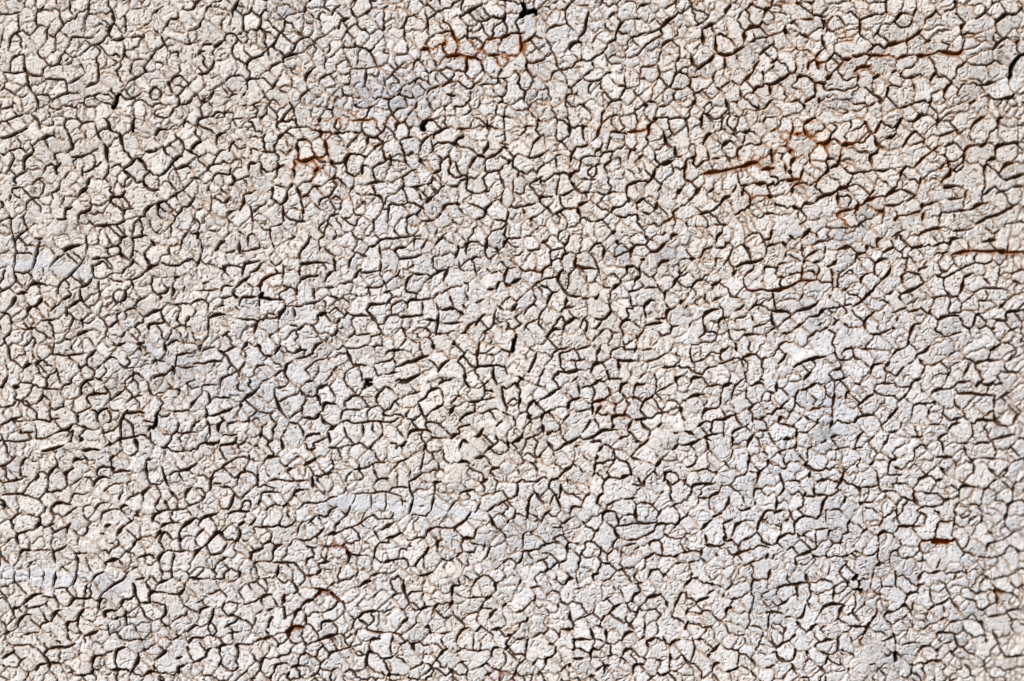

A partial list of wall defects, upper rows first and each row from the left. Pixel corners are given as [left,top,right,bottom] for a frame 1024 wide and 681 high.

rust [411,27,535,72]
rust [780,121,856,186]
crack [939,111,1008,190]
crack [290,366,343,459]
crack [0,445,132,545]
crack [3,609,99,681]
crack [69,645,185,681]
crack [231,505,338,619]
crack [283,567,469,681]
crack [390,455,714,681]
crack [620,554,775,681]
crack [880,561,1024,681]